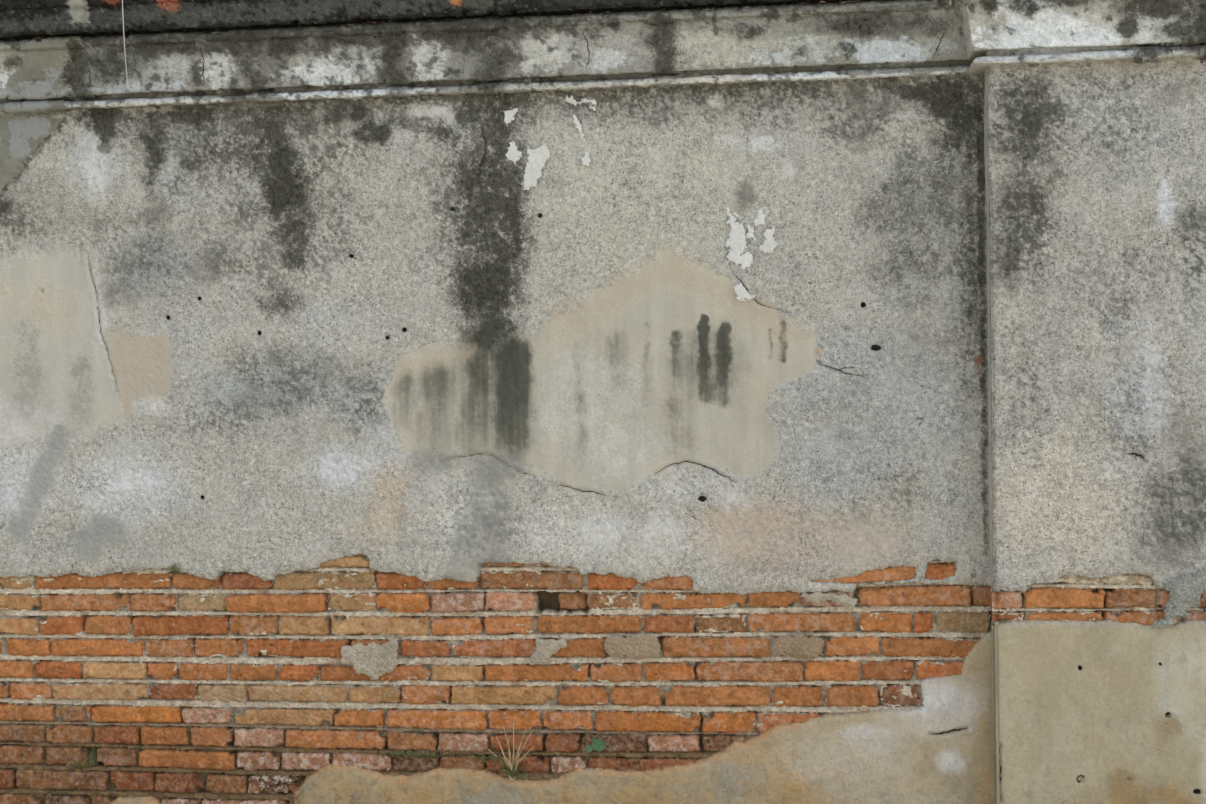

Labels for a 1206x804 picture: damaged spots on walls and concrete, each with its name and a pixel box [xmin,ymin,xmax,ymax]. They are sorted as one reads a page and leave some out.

damp [961,0,1092,36]
peeling [503,108,518,124]
peeling [505,140,550,190]
peeling [565,95,597,166]
damp [101,15,539,581]
peeling [380,206,822,494]
damp [670,314,733,407]
damp [769,320,788,363]
damp [846,52,1065,555]
flaking render [0,554,1206,804]